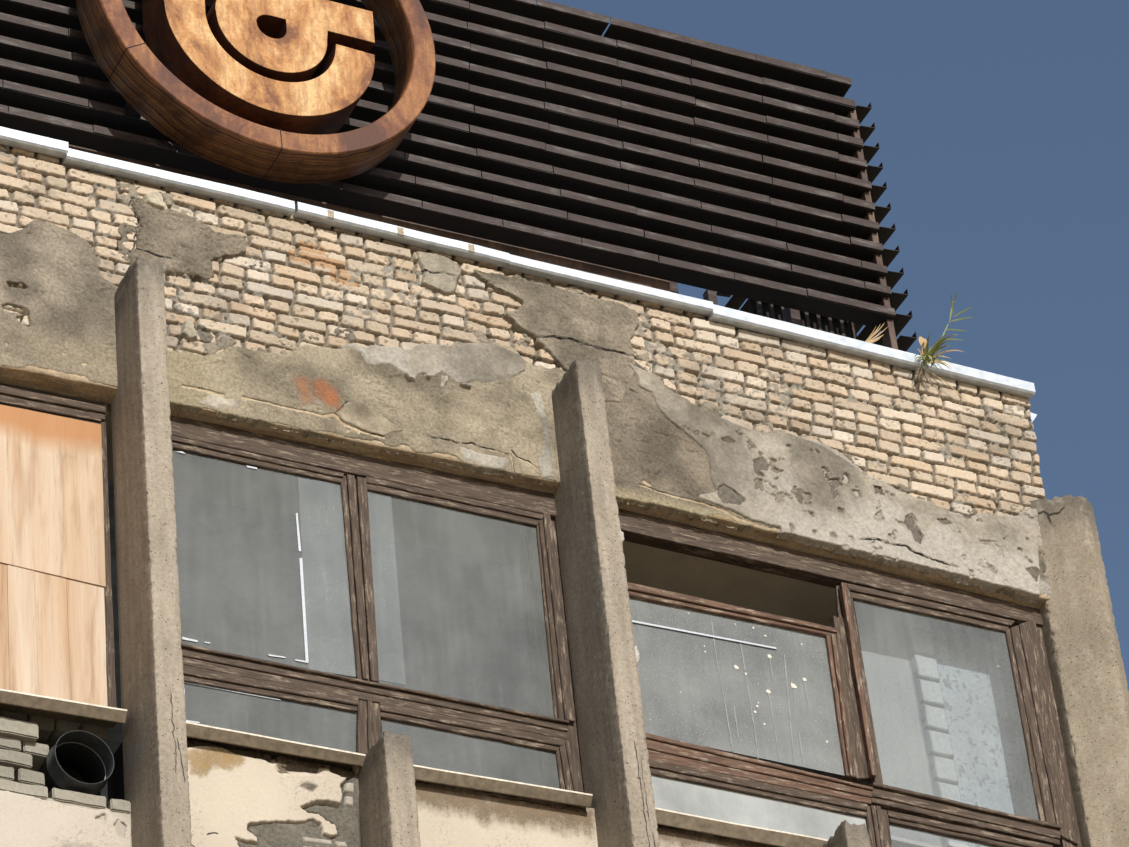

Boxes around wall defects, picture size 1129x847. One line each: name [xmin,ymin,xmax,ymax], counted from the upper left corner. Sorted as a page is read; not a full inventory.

crack [519,335,637,393]
peeling [166,252,1052,604]
crack [431,437,541,483]
crack [864,537,958,568]
peeling [187,737,361,847]